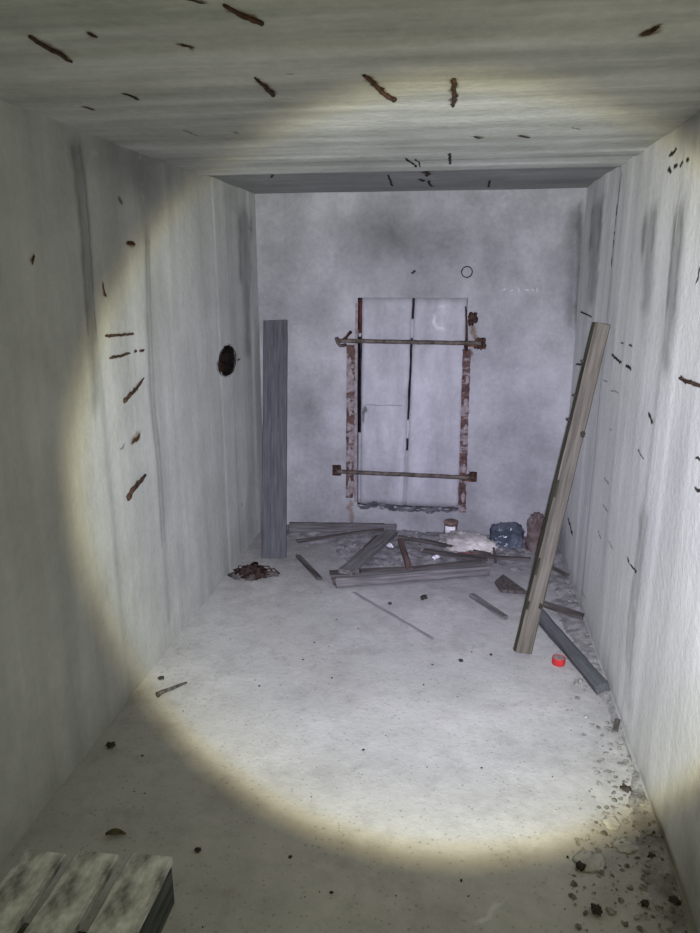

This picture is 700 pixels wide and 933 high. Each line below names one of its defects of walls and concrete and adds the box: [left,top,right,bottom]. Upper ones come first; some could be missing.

hole [218,344,240,377]